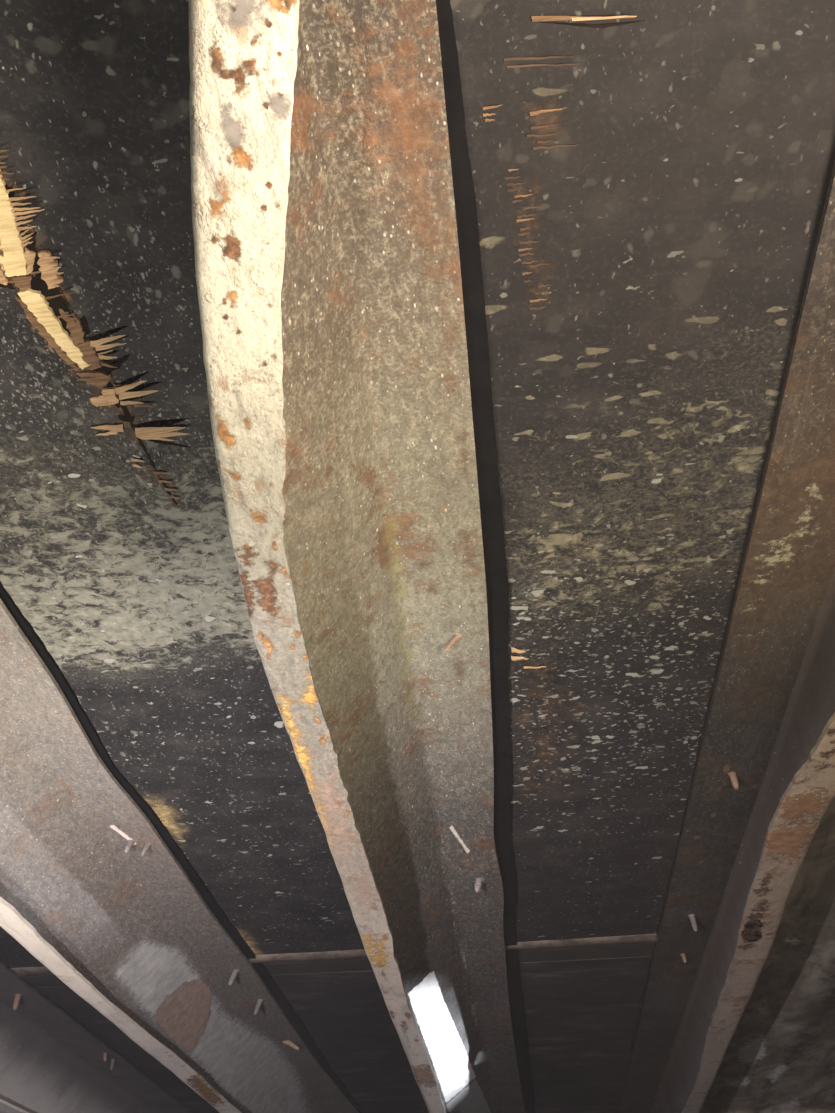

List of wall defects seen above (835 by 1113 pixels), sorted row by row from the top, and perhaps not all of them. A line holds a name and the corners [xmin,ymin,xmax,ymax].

corrosion [251,0,298,45]
corrosion [210,48,266,95]
corrosion [220,147,253,175]
corrosion [211,192,231,217]
corrosion [211,235,241,261]
corrosion [222,291,237,320]
crack [0,150,191,508]
corrosion [216,415,236,450]
corrosion [815,729,835,769]